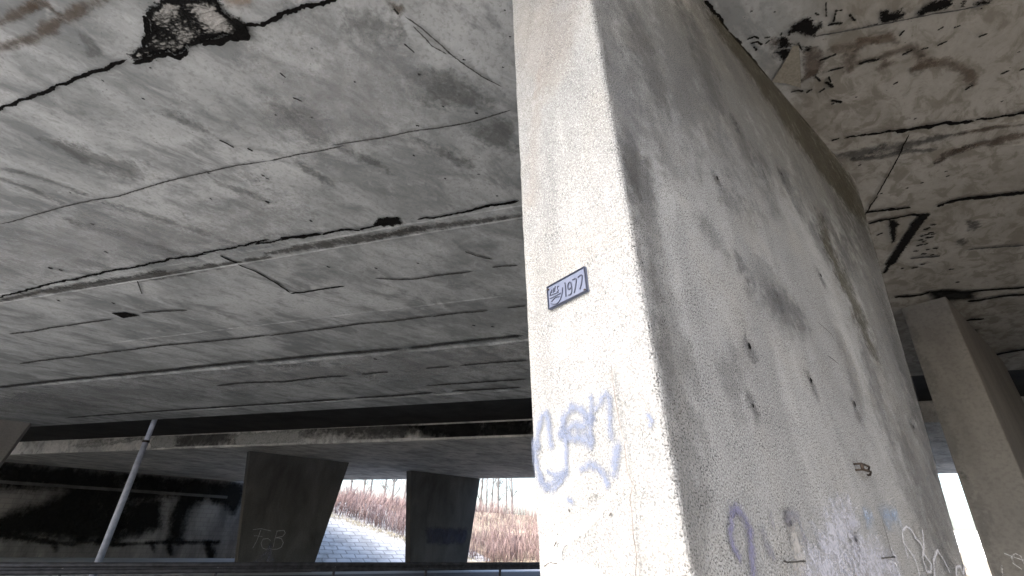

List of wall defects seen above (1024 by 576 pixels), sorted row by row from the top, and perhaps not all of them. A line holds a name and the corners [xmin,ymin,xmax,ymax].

spalling [126,0,251,68]
crack [245,0,337,27]
crack [704,0,768,78]
spalling [737,2,856,61]
crack [0,59,127,111]
crack [2,110,518,224]
crack [801,111,1024,224]
crack [0,223,388,313]
crack [969,243,1024,251]
damp [0,462,243,558]